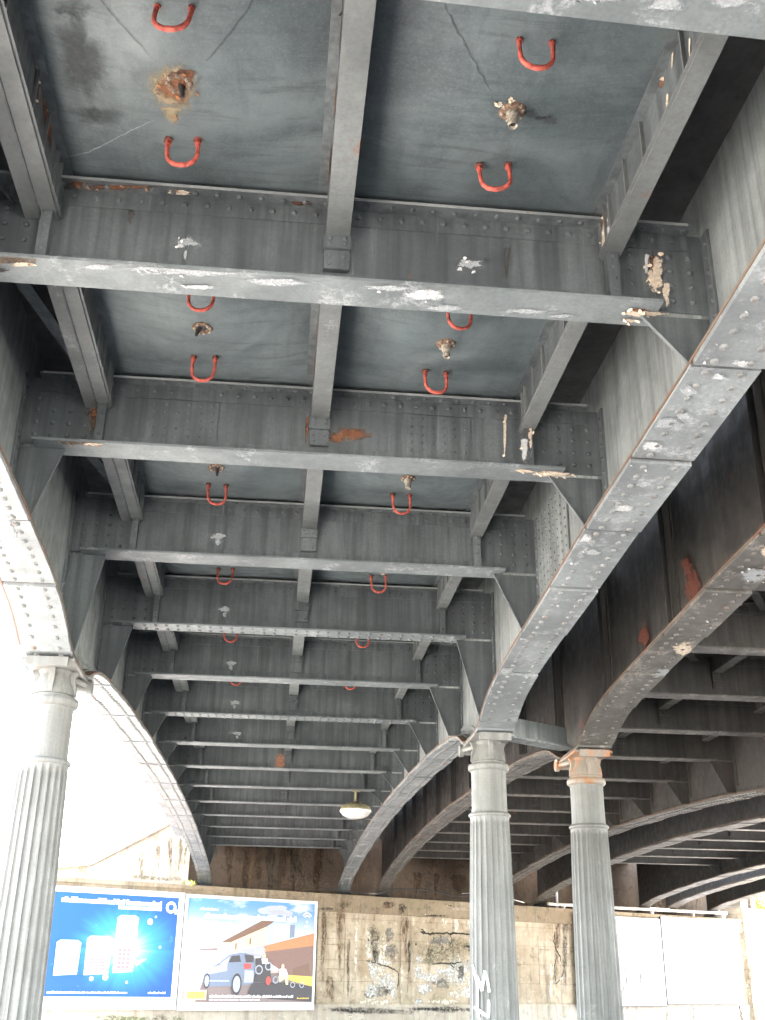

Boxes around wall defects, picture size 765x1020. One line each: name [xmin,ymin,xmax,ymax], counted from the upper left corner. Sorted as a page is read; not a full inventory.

peeling [650,0,681,10]
peeling [714,0,750,8]
rust [152,66,199,124]
rust [70,181,156,192]
peeling [622,252,670,326]
rust [329,428,369,443]
peeling [516,428,576,479]
damp [321,912,358,993]
damp [400,918,459,1005]
crack [421,929,470,968]